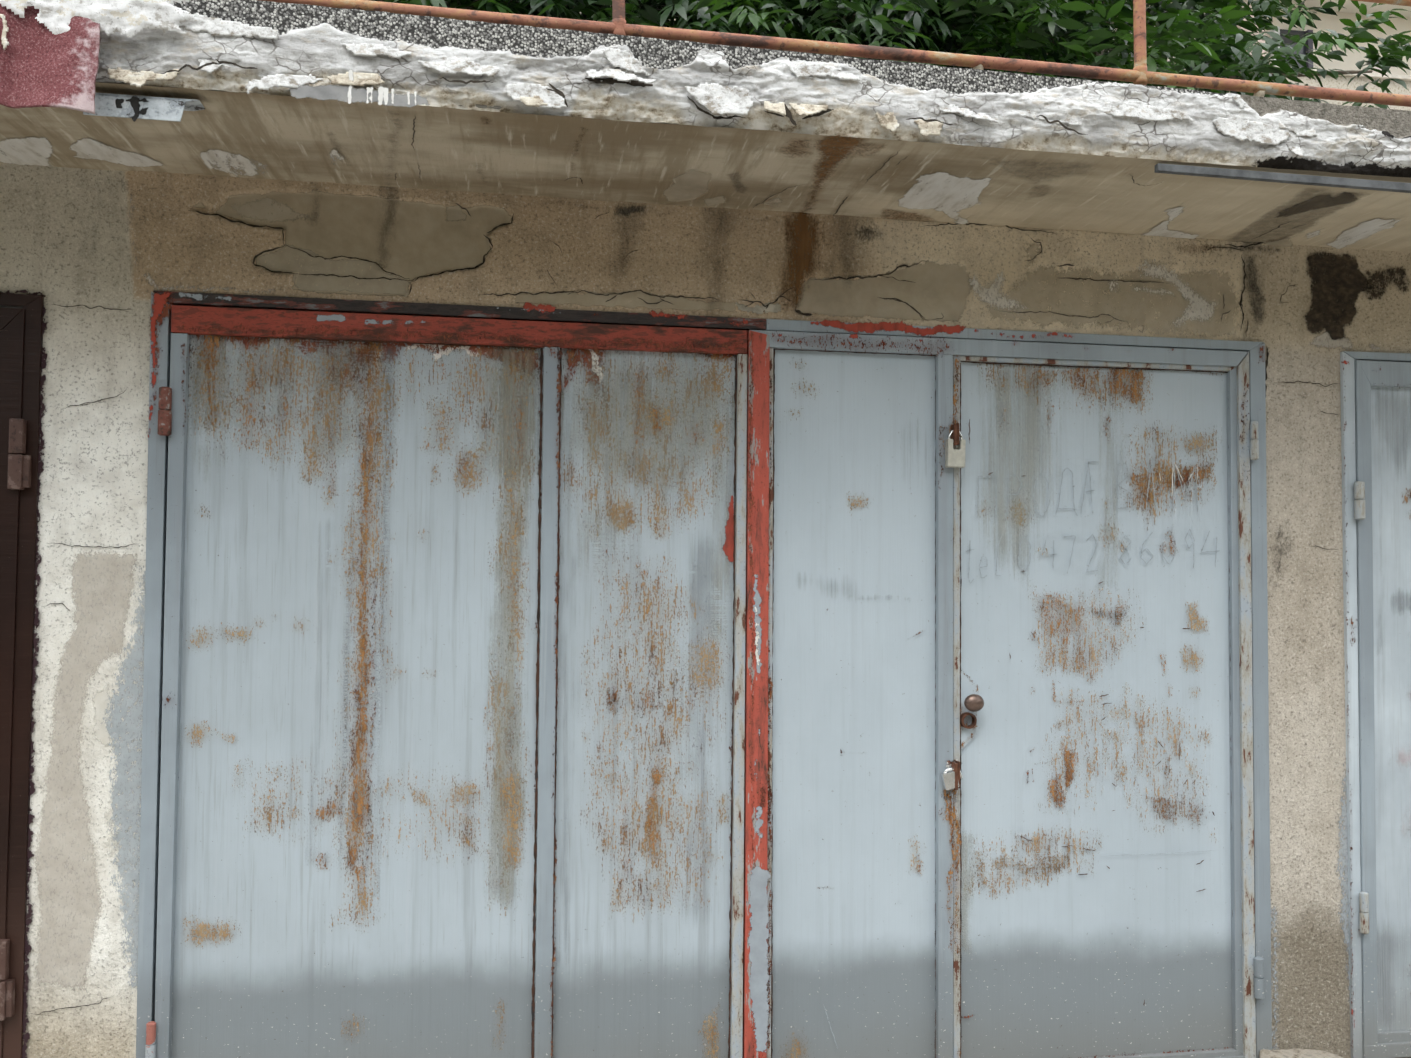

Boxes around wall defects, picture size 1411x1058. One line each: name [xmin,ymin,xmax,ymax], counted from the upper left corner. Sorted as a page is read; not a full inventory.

peeling [96,0,1411,178]
spalling [482,261,973,321]
damp [1303,252,1410,340]
corrosion [772,333,961,484]
corrosion [977,364,1217,554]
corrosion [181,335,736,927]
corrosion [938,586,1216,956]